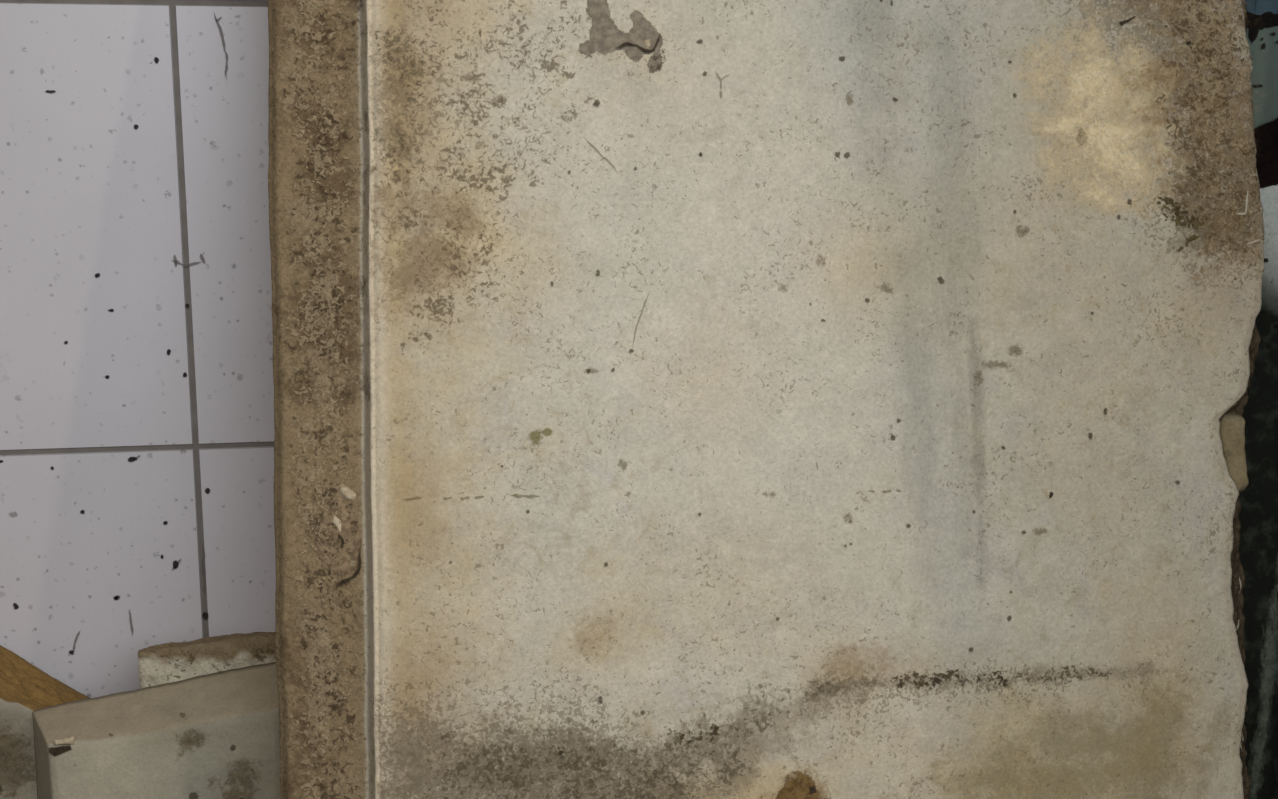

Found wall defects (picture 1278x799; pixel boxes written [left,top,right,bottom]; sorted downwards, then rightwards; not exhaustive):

damp [1030,0,1264,282]
rust [776,771,831,799]